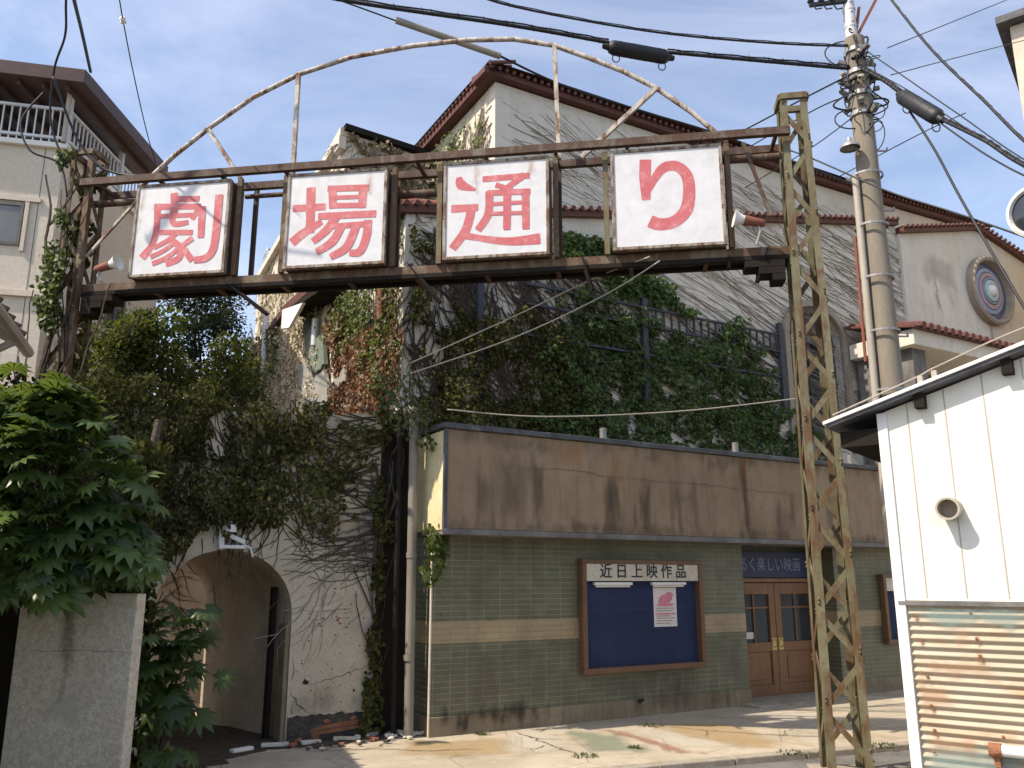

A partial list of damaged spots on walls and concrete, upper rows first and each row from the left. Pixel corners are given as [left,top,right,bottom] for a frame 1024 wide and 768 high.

flaking render [286,676,372,742]